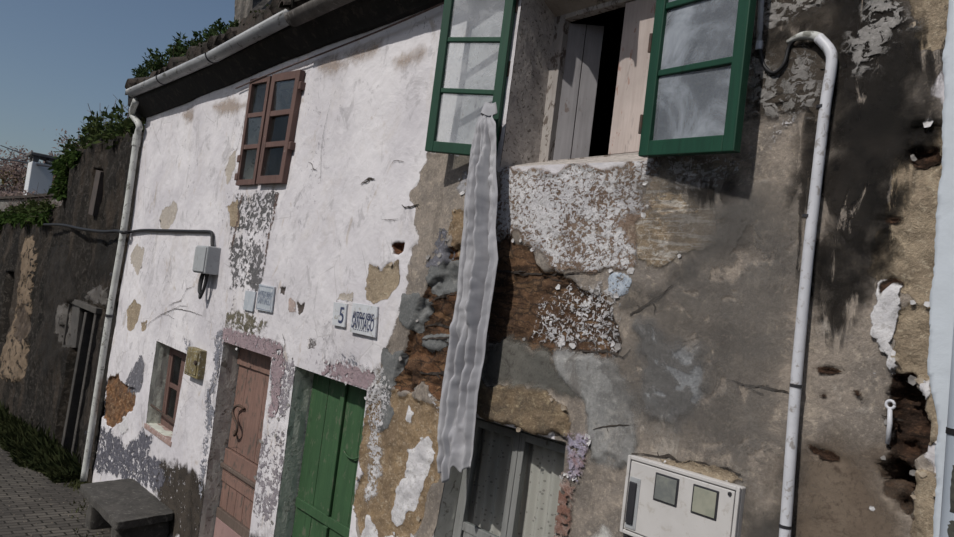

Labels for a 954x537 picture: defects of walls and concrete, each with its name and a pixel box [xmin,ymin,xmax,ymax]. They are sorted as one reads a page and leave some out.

flaking render [0,236,38,382]
flaking render [96,355,153,475]
peeling [130,244,144,275]
peeling [159,201,178,229]
peeling [227,199,240,227]
peeling [199,328,294,526]
flaking render [321,152,470,537]
flaking render [476,0,949,537]
water stain [746,0,946,331]